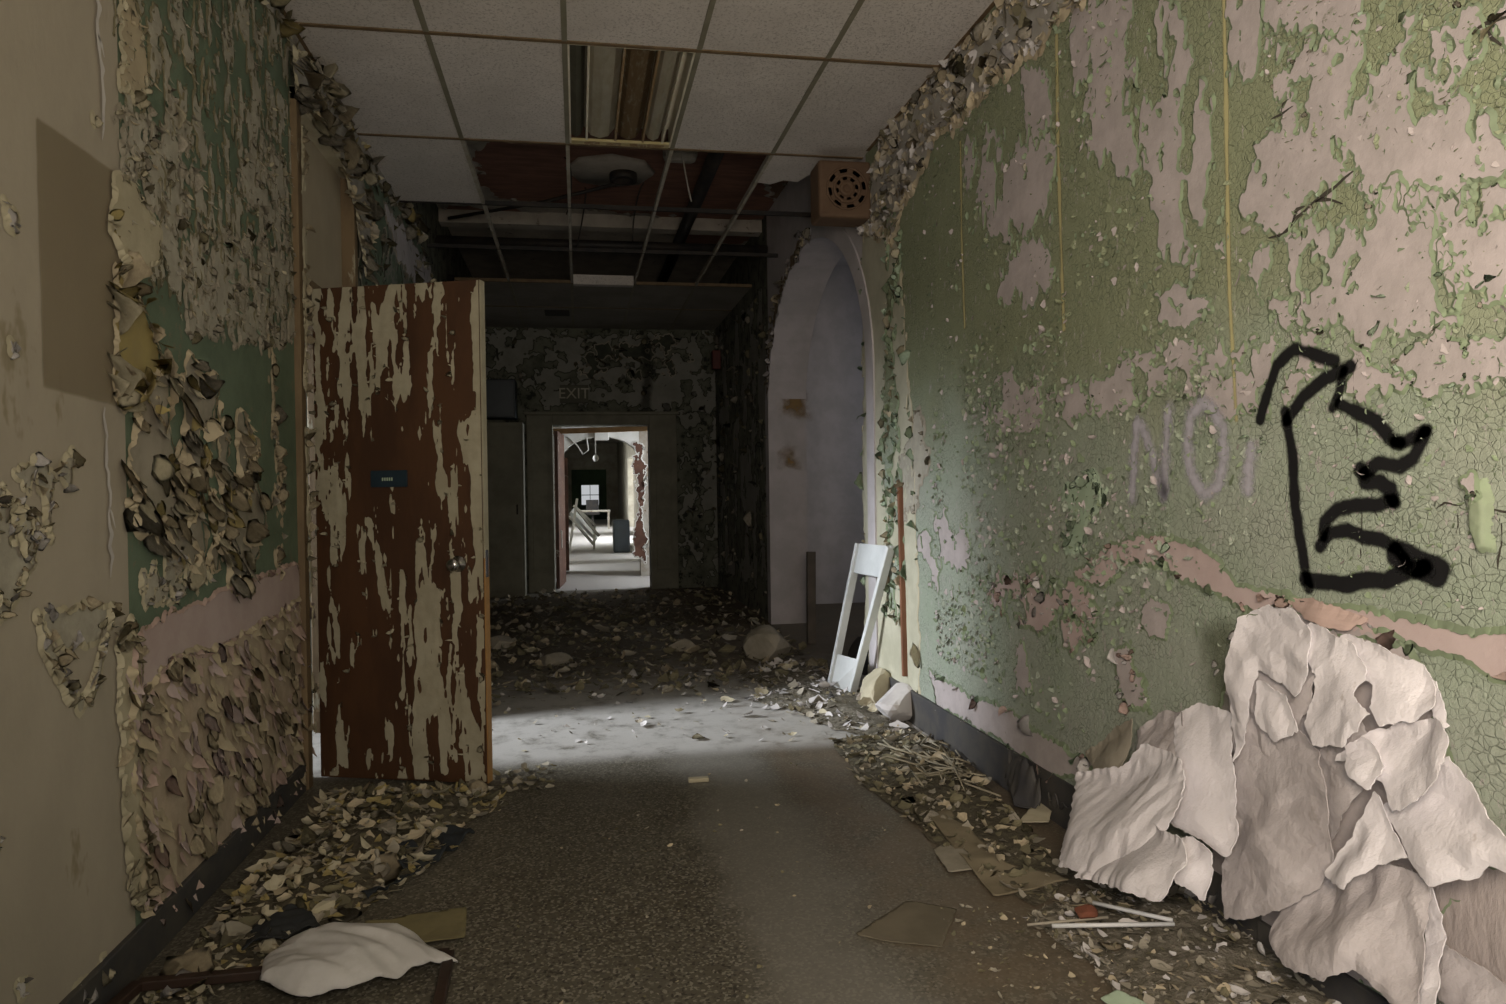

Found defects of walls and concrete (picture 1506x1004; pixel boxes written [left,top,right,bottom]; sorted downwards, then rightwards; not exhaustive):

peeling [0,0,433,913]
peeling [828,0,1506,1004]
peeling [71,951,117,1004]